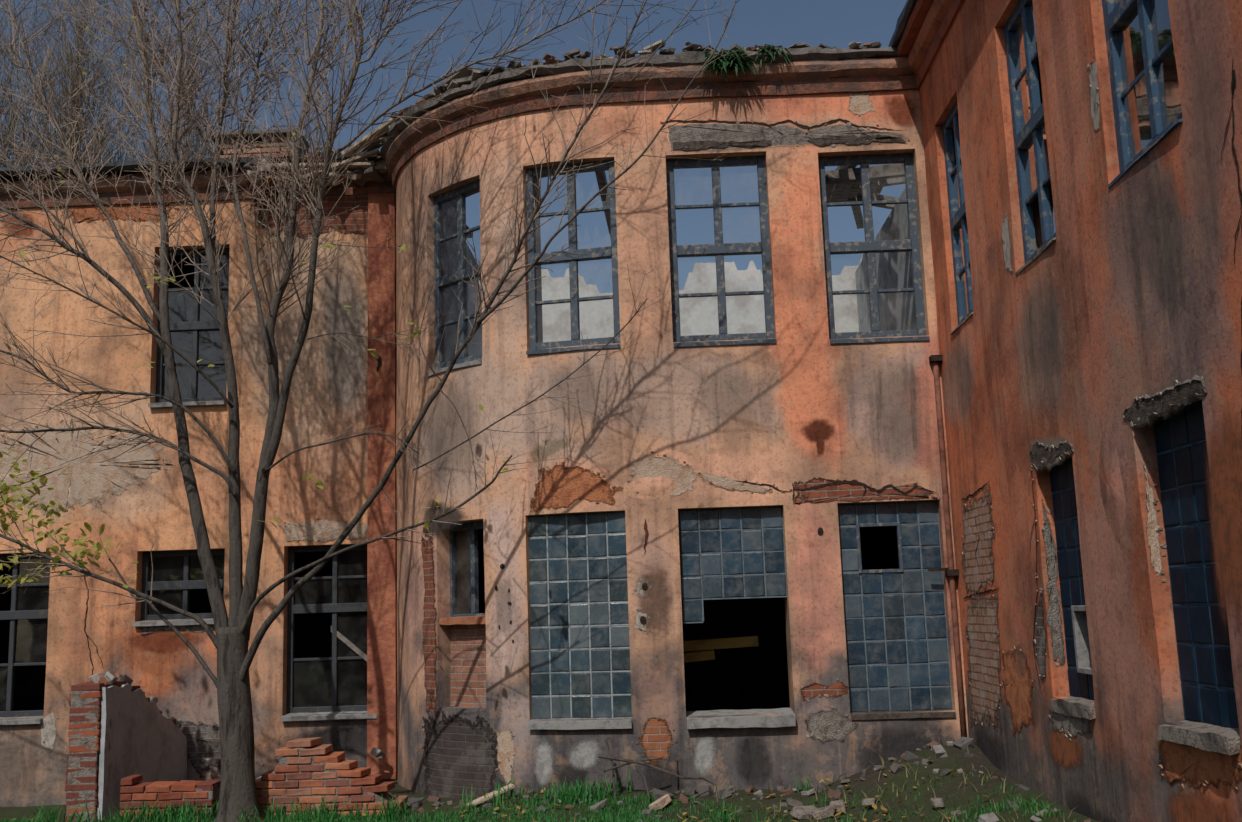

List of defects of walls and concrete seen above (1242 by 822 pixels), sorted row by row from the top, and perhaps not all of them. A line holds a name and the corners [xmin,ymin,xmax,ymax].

flaking render [667,92,910,151]
crack [1221,62,1242,262]
crack [1234,298,1242,370]
peeling [530,451,773,513]
flaking render [793,477,943,505]
crack [81,559,104,675]
flaking render [960,485,1091,740]
flaking render [421,527,516,799]
flaking render [636,717,677,765]
flaking render [1157,740,1242,790]